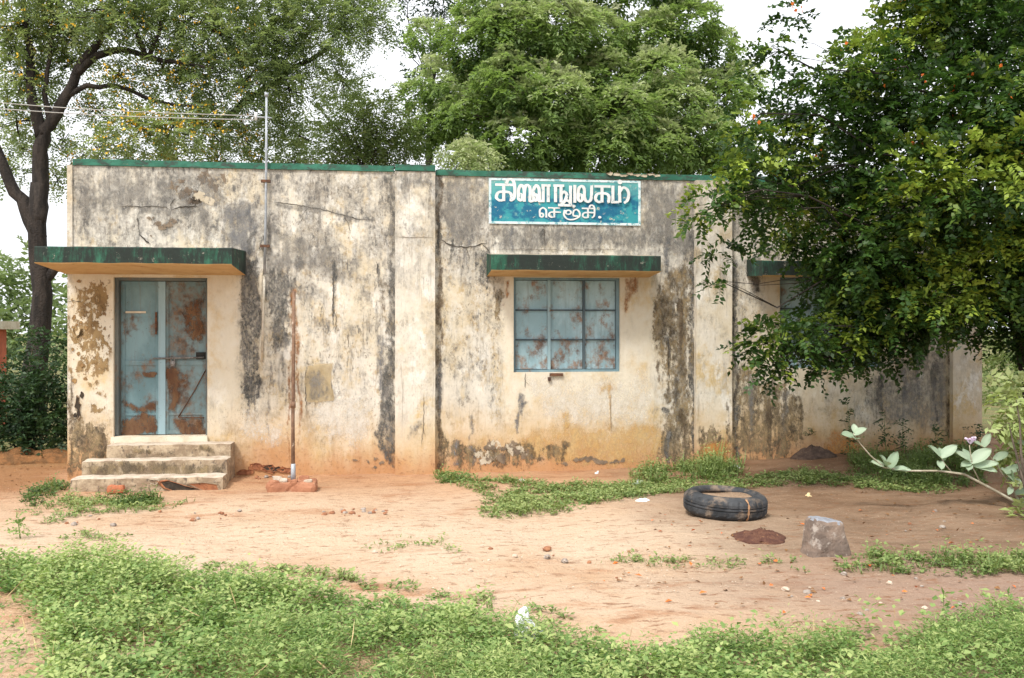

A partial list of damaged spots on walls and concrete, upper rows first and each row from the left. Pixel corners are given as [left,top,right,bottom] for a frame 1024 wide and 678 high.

crack [121,199,195,243]
crack [276,202,373,230]
peeling [67,280,112,421]
rust [121,401,157,435]
rust [142,367,206,435]
rust [184,299,204,342]
damp [77,173,345,440]
rust [287,318,302,426]
damp [319,172,569,471]
peeling [474,414,663,466]
damp [496,180,804,465]